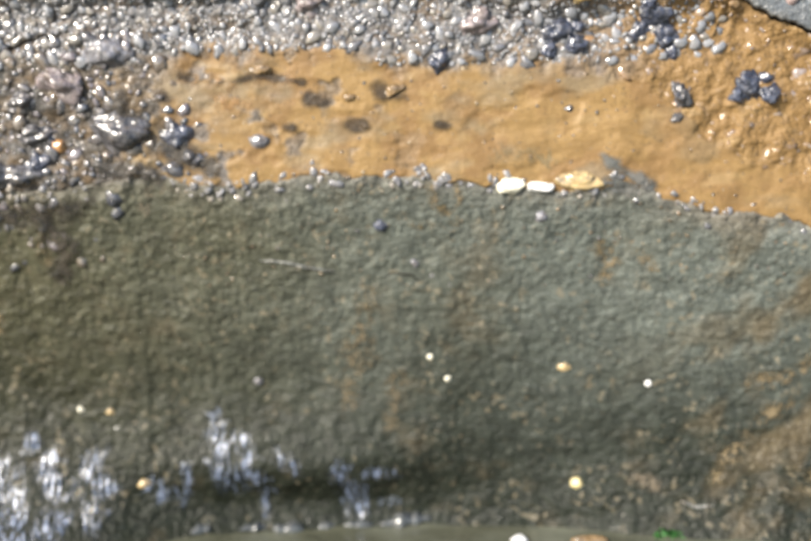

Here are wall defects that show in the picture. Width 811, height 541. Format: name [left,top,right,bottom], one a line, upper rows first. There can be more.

crack [711,0,811,38]
spalling [0,0,811,254]
damp [24,433,39,454]
damp [0,458,27,541]
damp [41,450,68,501]
damp [82,452,118,529]
damp [145,465,193,503]
damp [209,409,304,533]
damp [318,465,431,529]
damp [34,515,69,540]
damp [191,523,211,535]